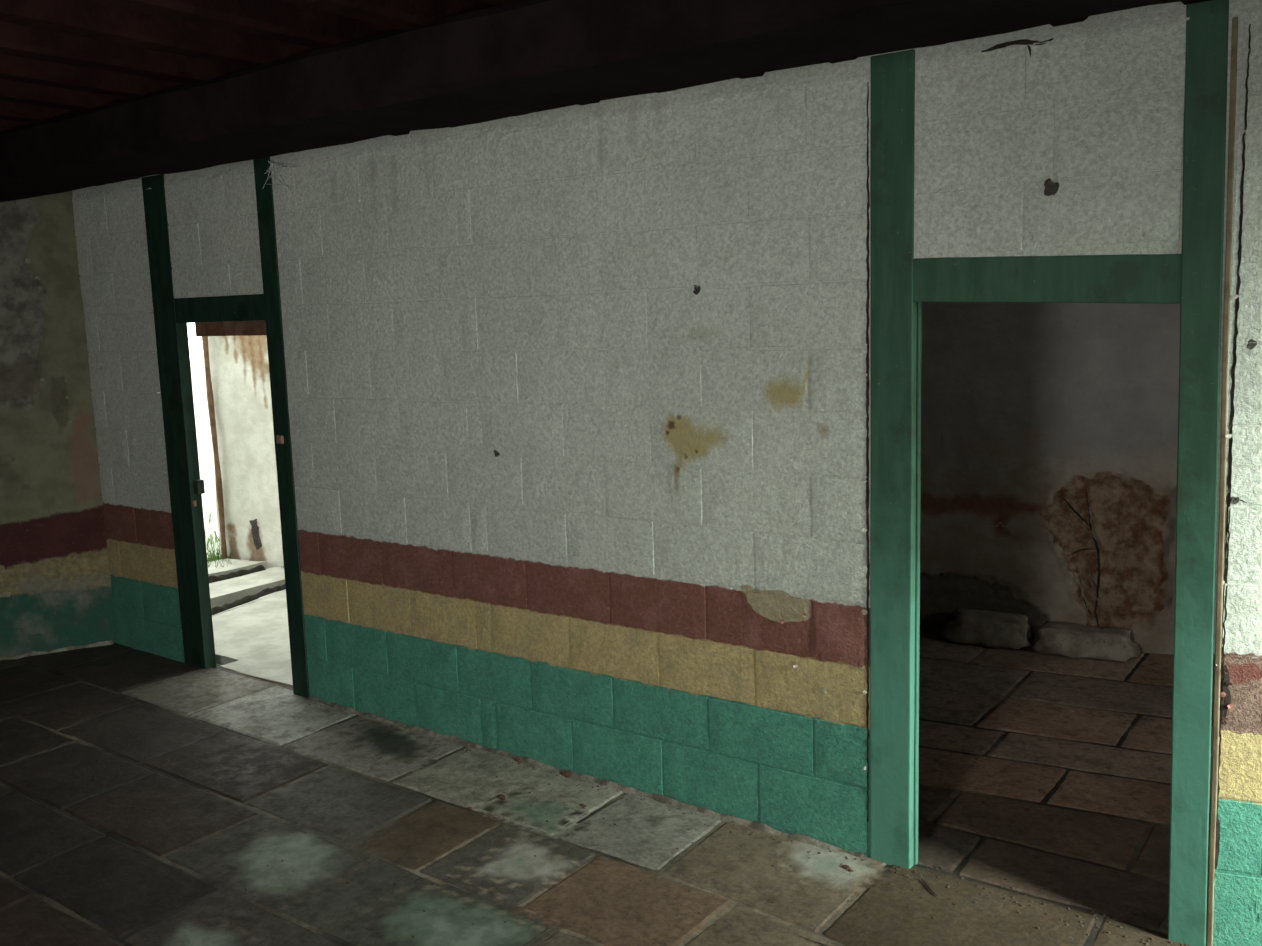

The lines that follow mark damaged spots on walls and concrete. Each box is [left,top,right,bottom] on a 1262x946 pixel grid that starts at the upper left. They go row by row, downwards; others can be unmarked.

corrosion [753,355,823,425]
corrosion [657,402,736,500]
peeling [737,581,870,669]
spalling [920,568,1056,642]
peeling [1212,648,1262,737]